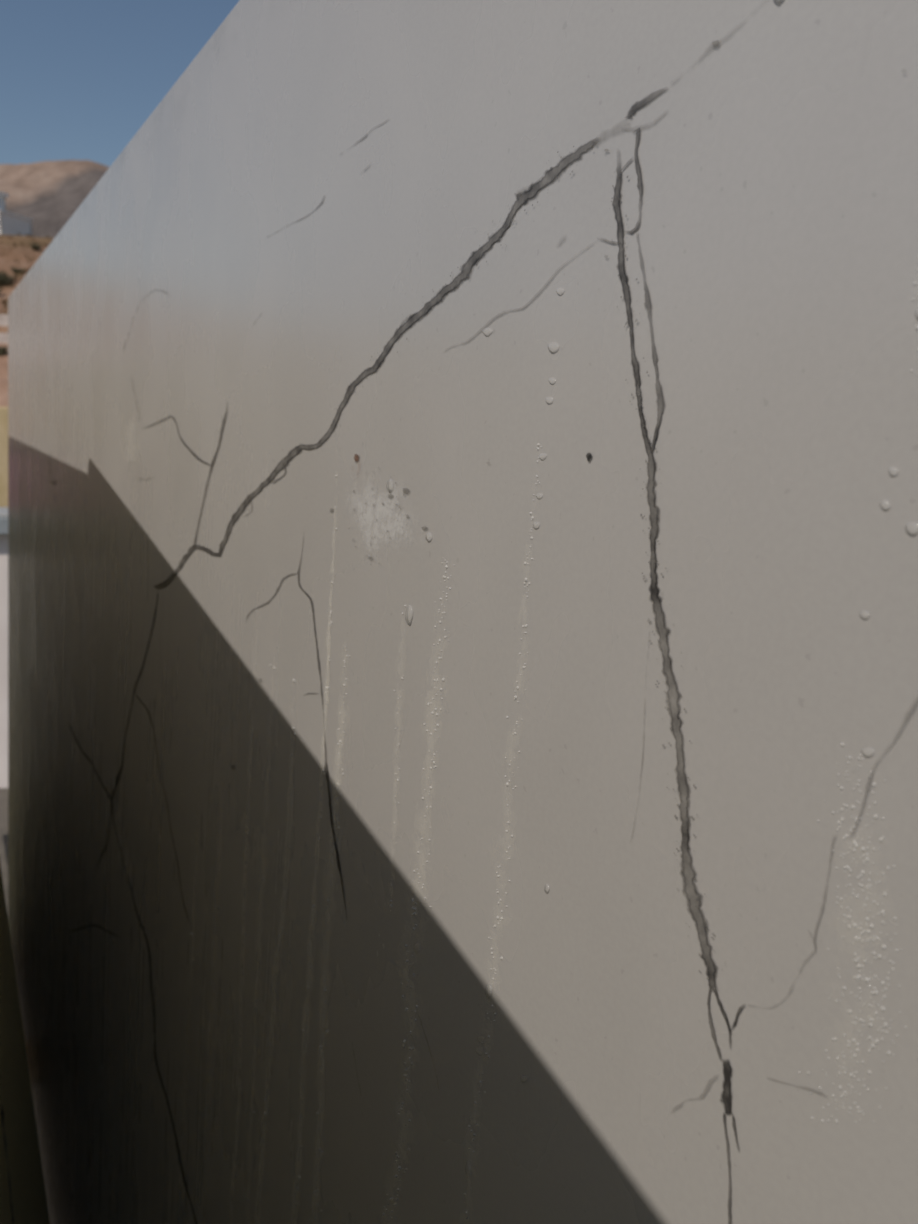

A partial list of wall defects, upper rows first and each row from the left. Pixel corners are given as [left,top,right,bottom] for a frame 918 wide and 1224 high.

crack [70,138,597,1224]
crack [603,89,743,1224]